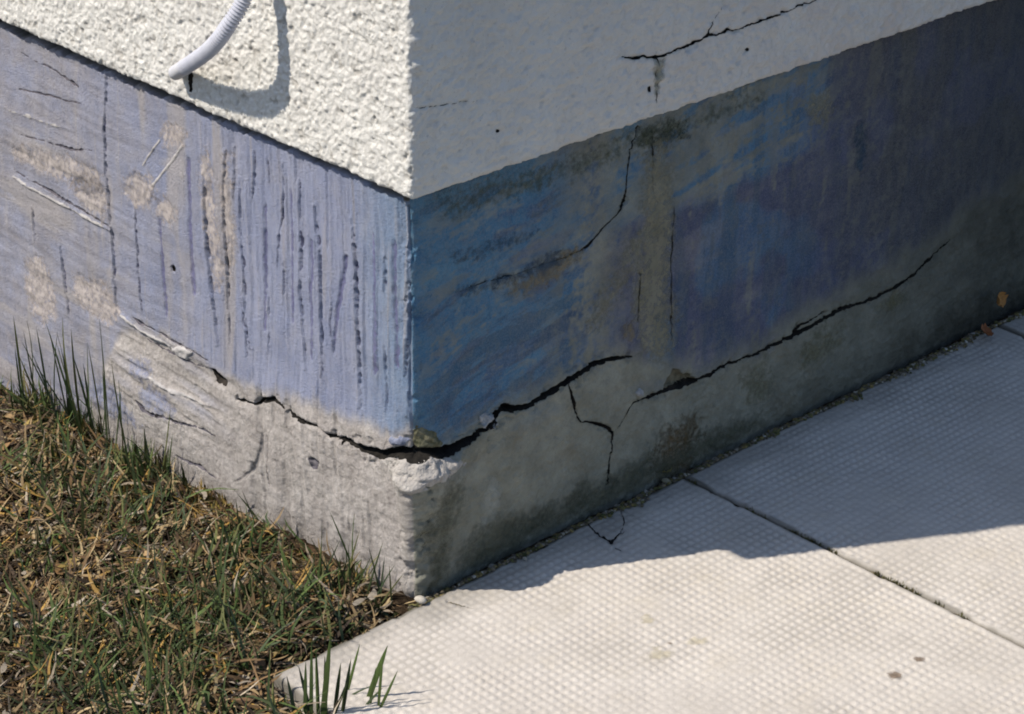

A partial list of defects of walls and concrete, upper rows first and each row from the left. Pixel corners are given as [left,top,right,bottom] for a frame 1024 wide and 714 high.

crack [622,0,816,101]
crack [473,125,654,286]
crack [668,213,676,340]
peeling [172,345,192,360]
spalling [211,368,228,386]
crack [237,239,950,484]
spalling [384,436,466,495]